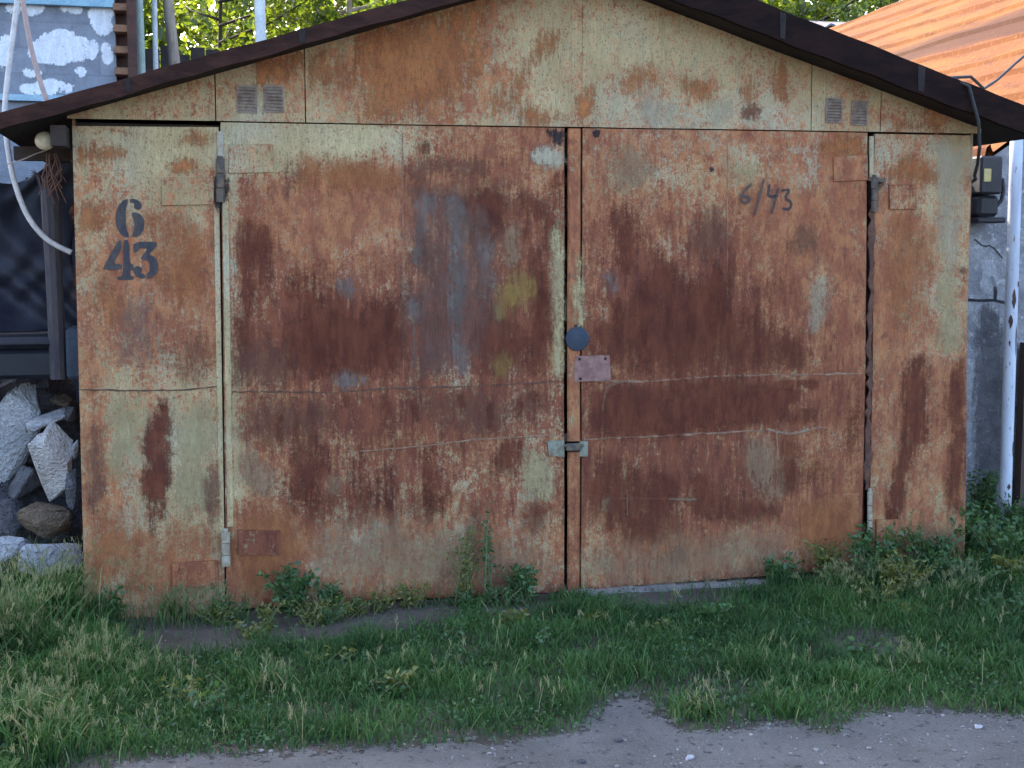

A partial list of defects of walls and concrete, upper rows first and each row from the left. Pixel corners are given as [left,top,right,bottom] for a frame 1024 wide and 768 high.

corrosion [77,142,127,165]
corrosion [165,158,198,174]
corrosion [256,4,484,124]
corrosion [492,30,564,146]
corrosion [574,85,595,117]
corrosion [740,81,762,120]
corrosion [235,222,272,371]
corrosion [514,173,564,374]
corrosion [140,398,174,536]
corrosion [205,460,221,524]
corrosion [884,354,929,519]
corrosion [945,362,968,513]